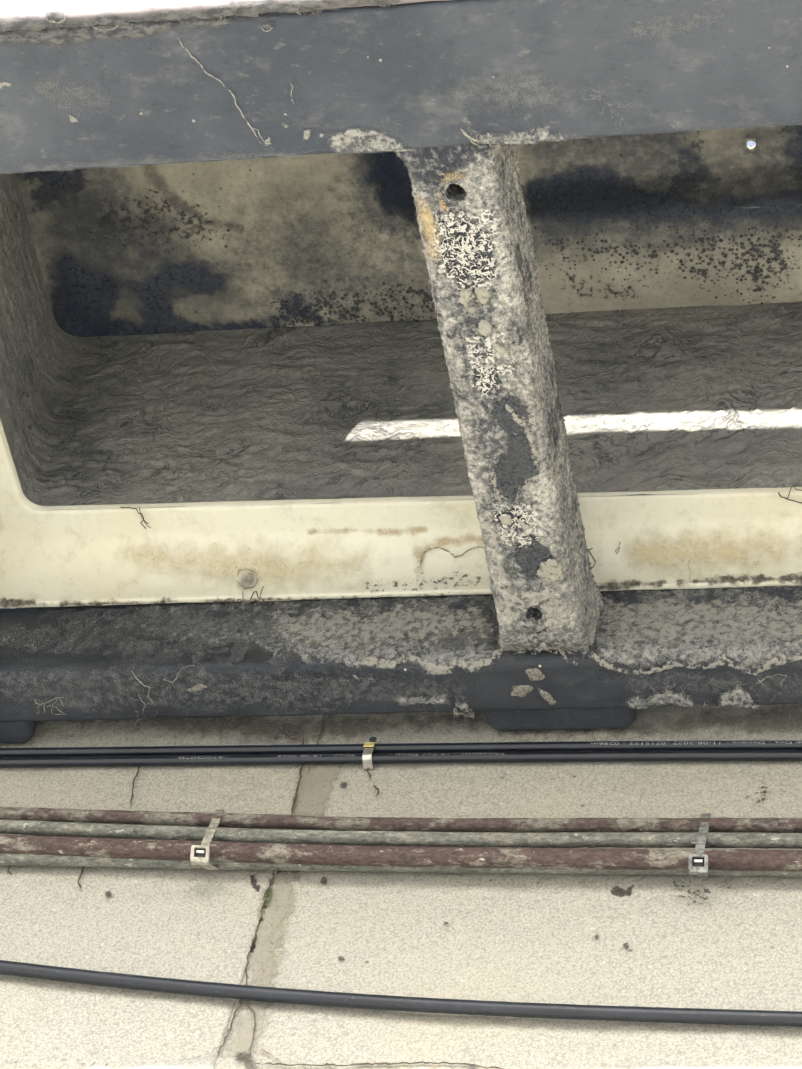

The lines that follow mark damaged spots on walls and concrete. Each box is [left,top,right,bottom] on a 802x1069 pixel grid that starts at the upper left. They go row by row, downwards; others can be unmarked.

crack [177,37,266,144]
damp [351,151,416,231]
corrosion [421,194,448,256]
mould [525,125,802,304]
damp [19,169,523,416]
damp [247,405,572,658]
damp [0,625,210,656]
peeling [136,586,802,680]
peeling [510,668,557,705]
crack [179,870,503,1069]